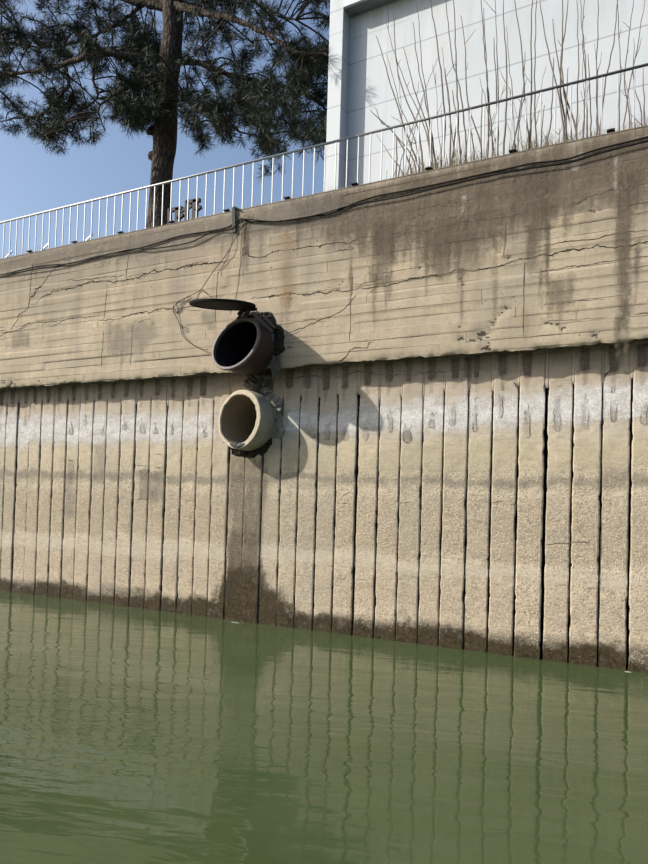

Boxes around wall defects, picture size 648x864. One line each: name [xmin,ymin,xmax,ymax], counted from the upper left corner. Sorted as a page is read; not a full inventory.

crack [0,212,436,367]
crack [256,168,648,382]
water stain [289,130,648,325]
water stain [286,382,648,434]